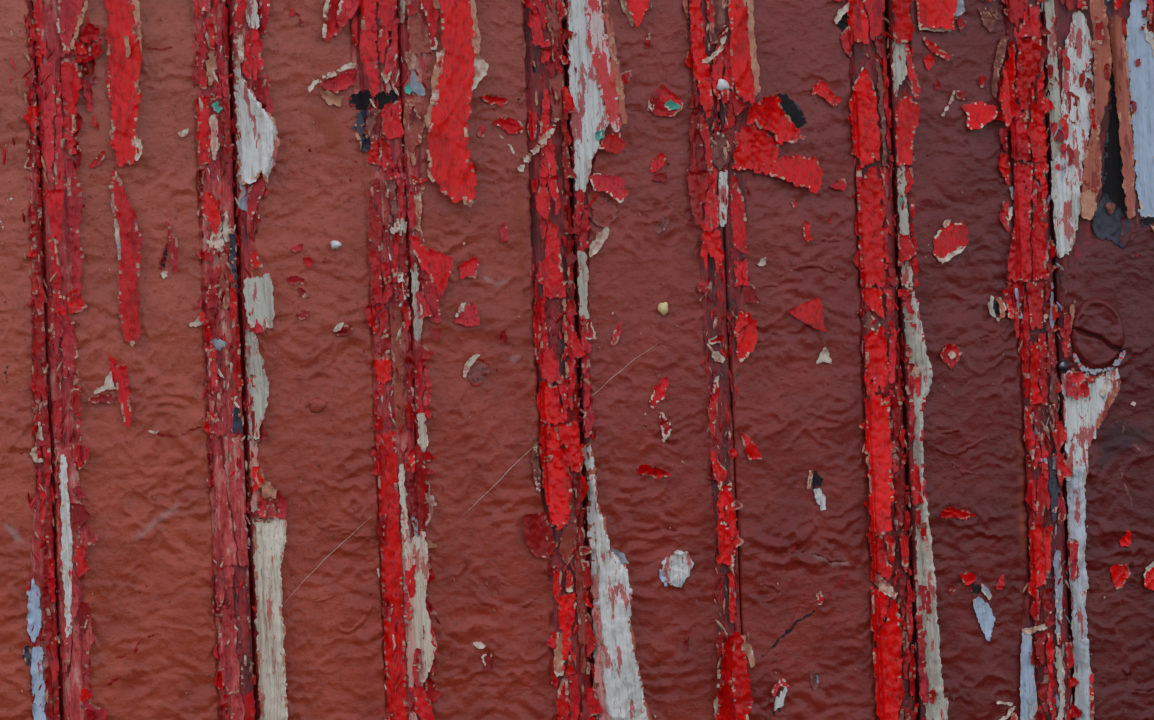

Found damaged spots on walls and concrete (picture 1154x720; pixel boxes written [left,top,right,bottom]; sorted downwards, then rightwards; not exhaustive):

peeling [619,0,651,48]
peeling [158,221,180,279]
peeling [286,243,314,320]
peeling [177,0,288,720]
peeling [308,0,629,720]
peeling [647,0,1154,720]
peeling [637,464,671,479]